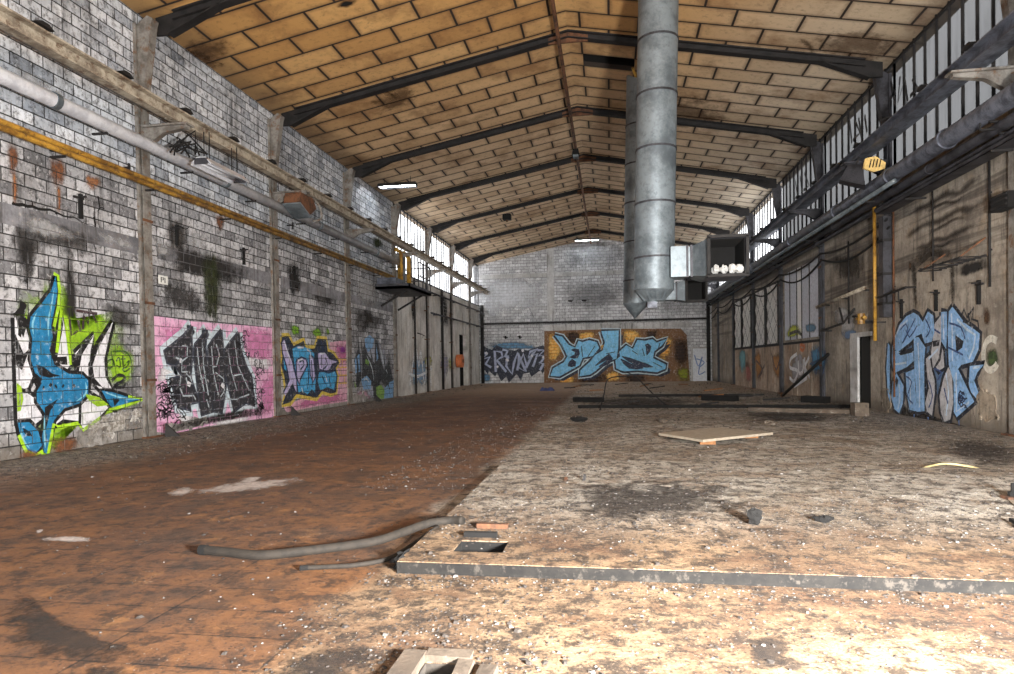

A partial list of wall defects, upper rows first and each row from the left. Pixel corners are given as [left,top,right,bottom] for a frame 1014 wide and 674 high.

rust [8,146,18,201]
rust [51,160,64,208]
water stain [16,219,67,259]
water stain [160,281,201,314]